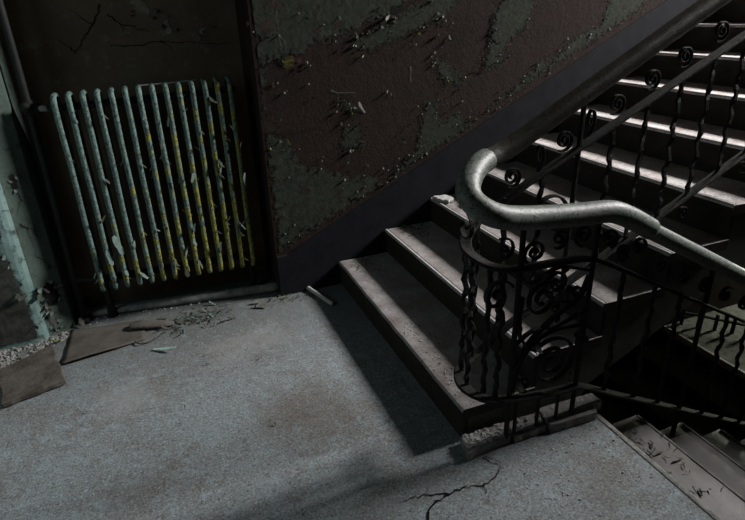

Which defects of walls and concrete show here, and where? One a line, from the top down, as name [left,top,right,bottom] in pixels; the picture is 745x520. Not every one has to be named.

crack [59,4,227,58]
peeling [478,0,537,72]
peeling [246,0,483,252]
spalling [0,253,39,346]
peeling [37,279,64,341]
crack [402,456,503,520]